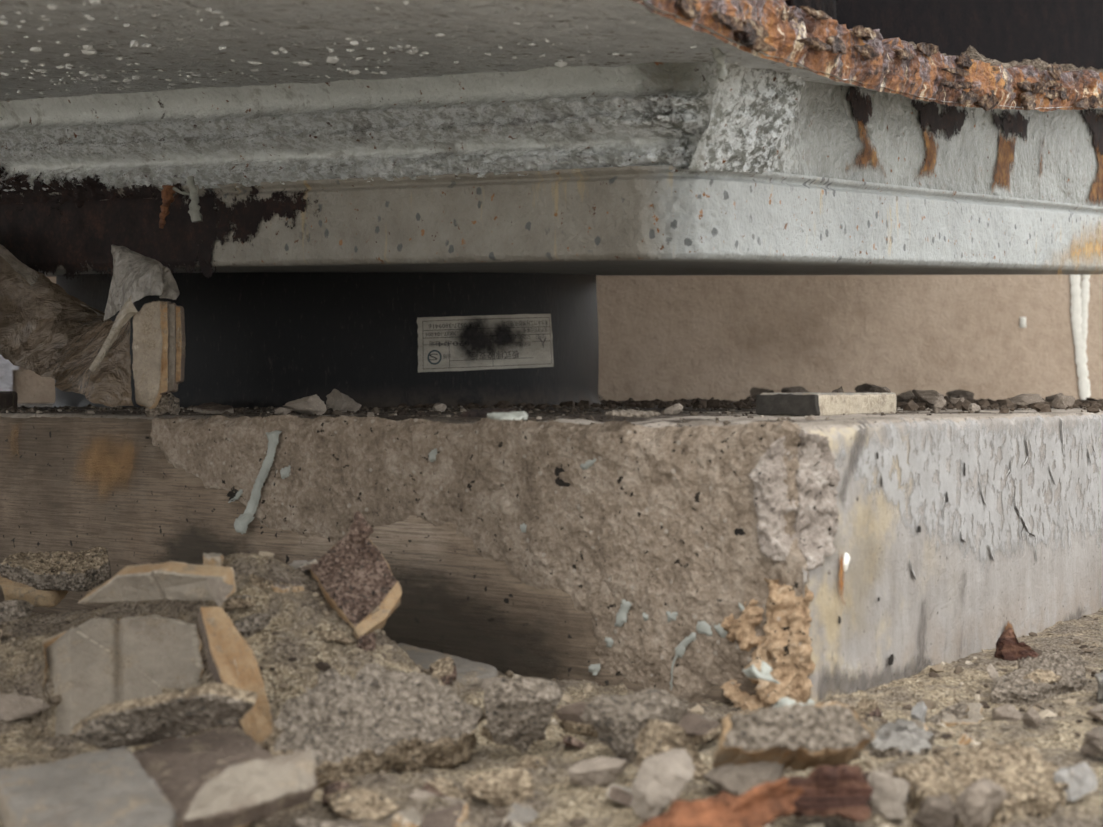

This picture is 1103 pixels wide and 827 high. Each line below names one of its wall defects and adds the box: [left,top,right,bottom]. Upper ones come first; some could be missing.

corrosion [836,0,1103,70]
corrosion [840,85,886,176]
corrosion [911,99,974,177]
corrosion [991,109,1030,191]
corrosion [1080,108,1103,204]
spalling [150,392,1103,744]